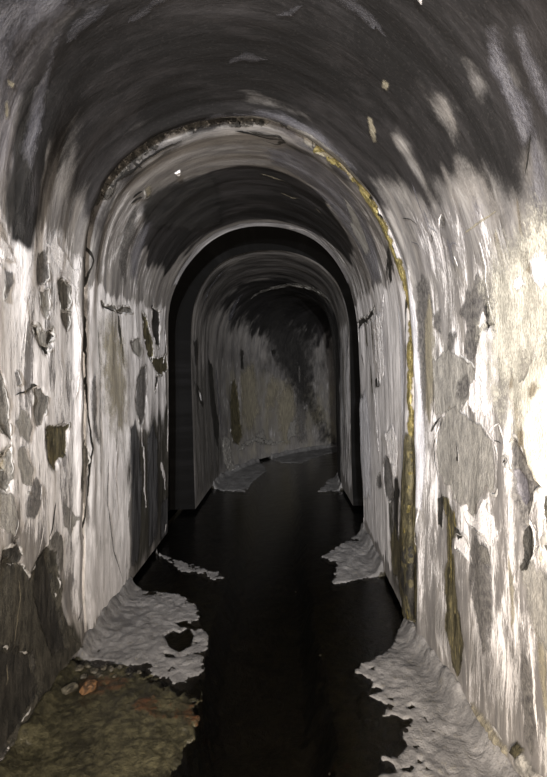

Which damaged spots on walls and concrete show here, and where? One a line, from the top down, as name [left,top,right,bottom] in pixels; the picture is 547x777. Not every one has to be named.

damp [0,0,60,39]
damp [6,76,51,245]
spalling [3,270,14,302]
spalling [0,371,83,758]
spalling [31,250,73,368]
damp [38,488,80,574]
damp [46,234,82,410]
damp [92,319,168,576]
peeling [101,300,168,426]
damp [164,114,499,581]
peeling [432,208,547,650]
damp [513,250,547,290]